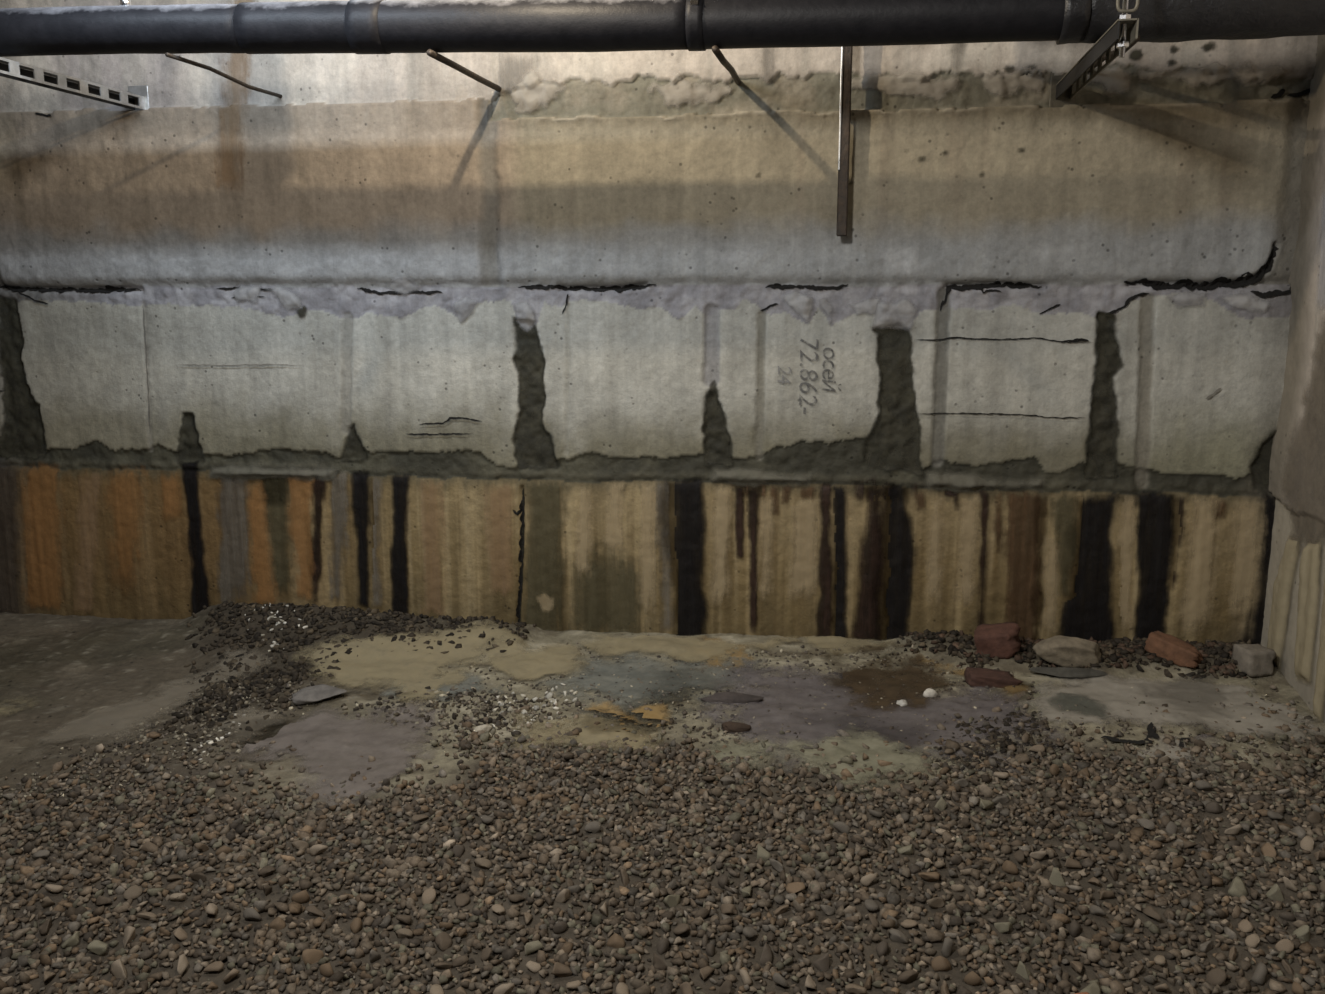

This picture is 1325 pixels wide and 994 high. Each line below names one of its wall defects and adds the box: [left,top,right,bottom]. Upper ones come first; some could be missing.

spalling [511,71,565,112]
spalling [851,72,958,100]
spalling [1087,42,1284,93]
crack [1108,242,1291,314]
spalling [0,297,46,459]
spalling [177,413,204,463]
spalling [513,302,558,469]
spalling [701,381,733,466]
spalling [850,299,923,475]
spalling [1084,312,1122,479]
leakage [182,461,290,614]
leakage [218,471,1106,808]